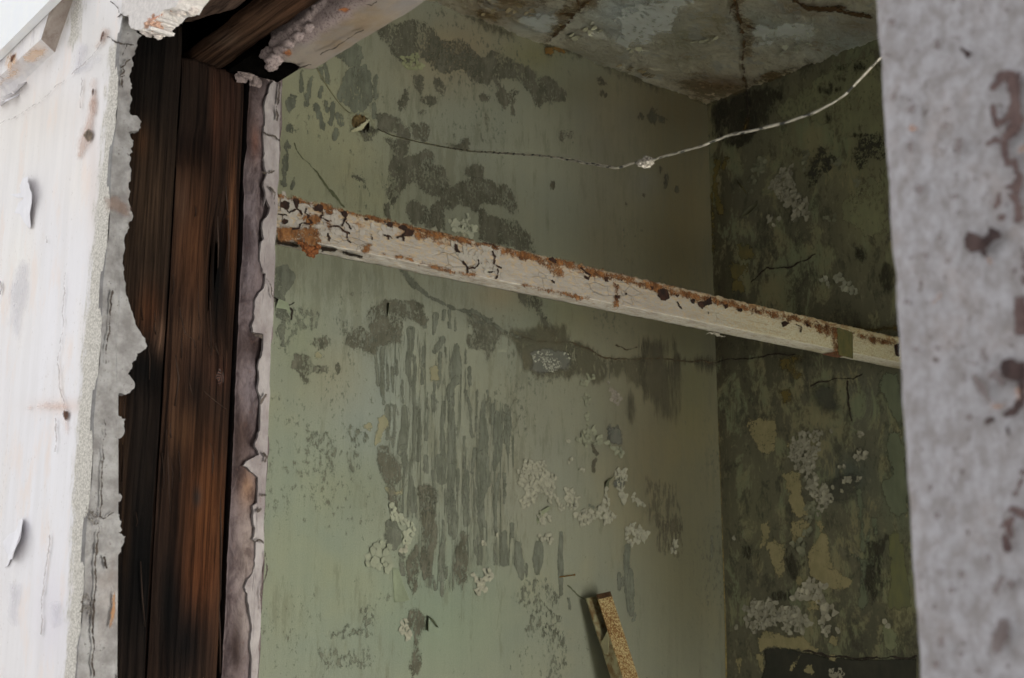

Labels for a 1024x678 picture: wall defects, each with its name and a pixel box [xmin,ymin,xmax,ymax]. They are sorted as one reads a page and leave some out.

damp [711,86,782,149]
damp [854,126,886,170]
spalling [75,0,209,678]
peeling [242,19,572,678]
rust [277,194,838,354]
rust [853,325,900,357]
damp [879,262,894,292]
peeling [336,298,651,678]
peeling [734,418,869,678]